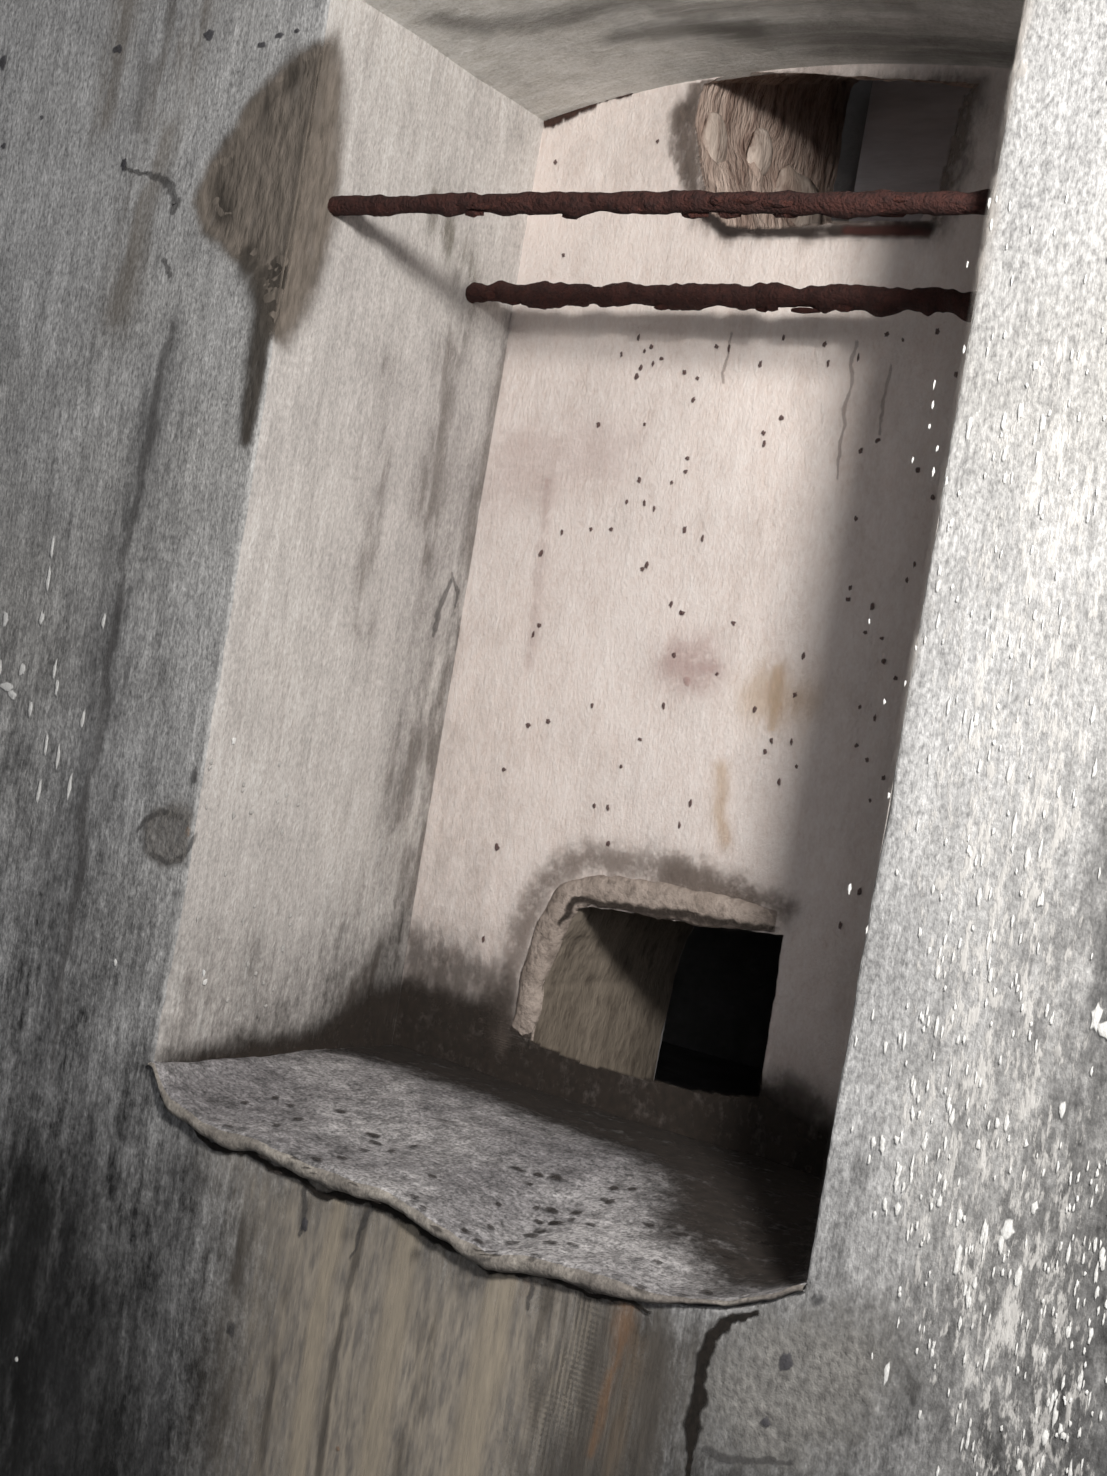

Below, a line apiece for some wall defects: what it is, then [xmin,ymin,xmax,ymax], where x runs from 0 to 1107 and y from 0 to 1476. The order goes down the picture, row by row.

rust [465,197,523,218]
rust [681,194,760,219]
rust [755,304,855,314]
leakage [498,849,791,1048]
leakage [0,1162,135,1476]
leakage [233,1182,692,1476]